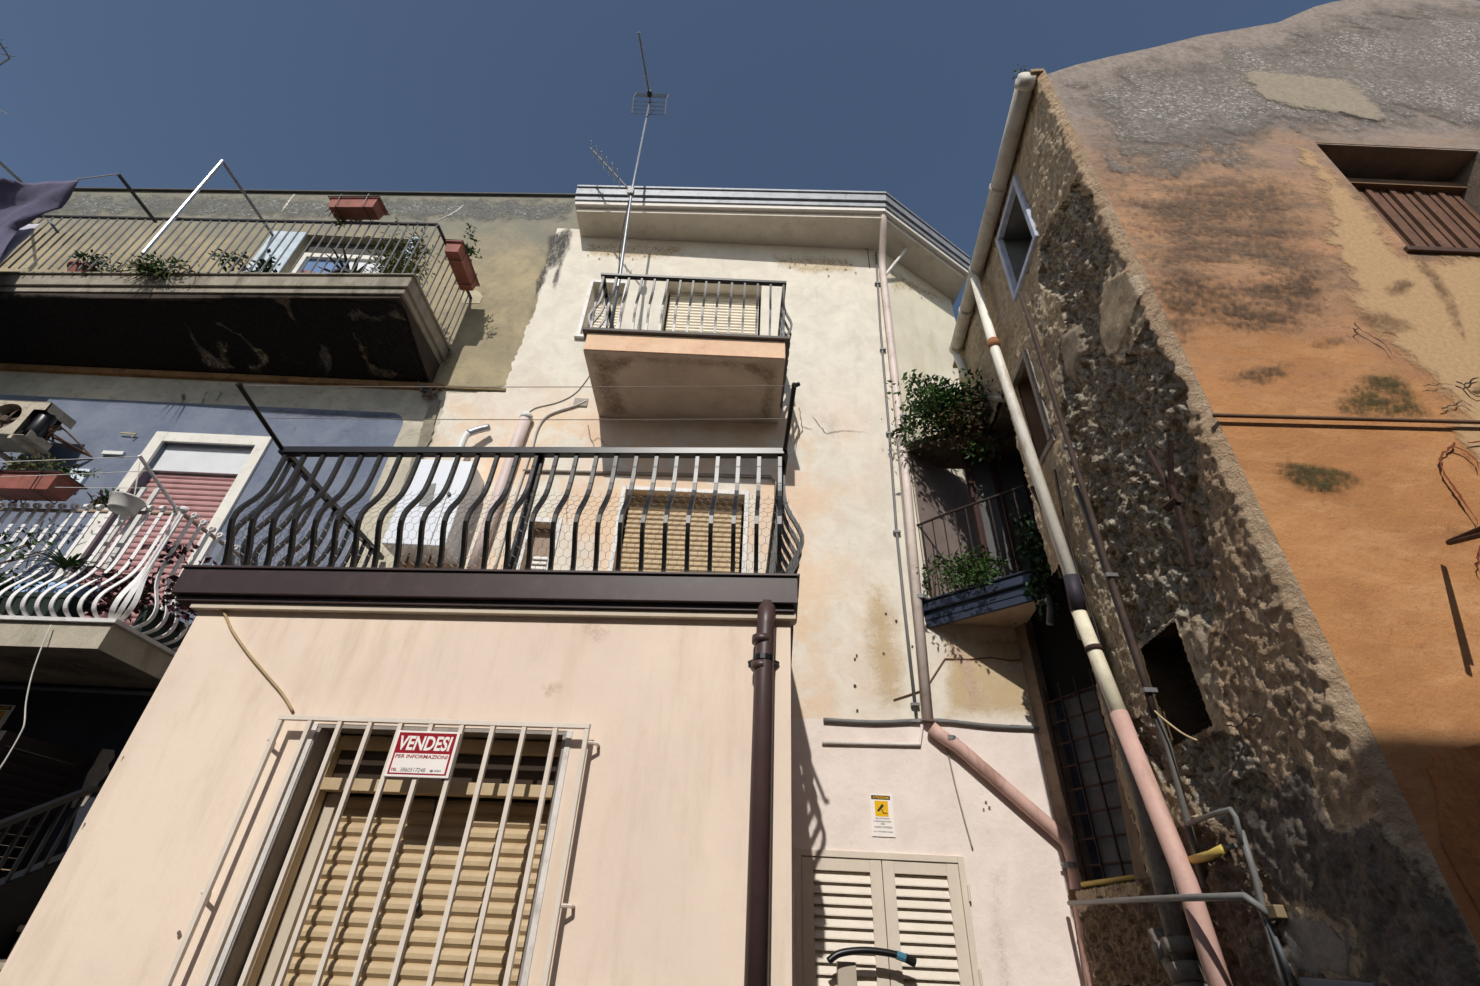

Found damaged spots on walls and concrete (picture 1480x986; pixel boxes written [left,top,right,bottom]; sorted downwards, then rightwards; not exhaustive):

leakage [1130,183,1320,331]
leakage [0,294,427,383]
spalling [1038,180,1219,656]
leakage [1279,463,1355,491]
leakage [1339,375,1425,417]
crack [1424,377,1480,573]
crack [1215,714,1262,809]
peeling [1426,742,1480,915]